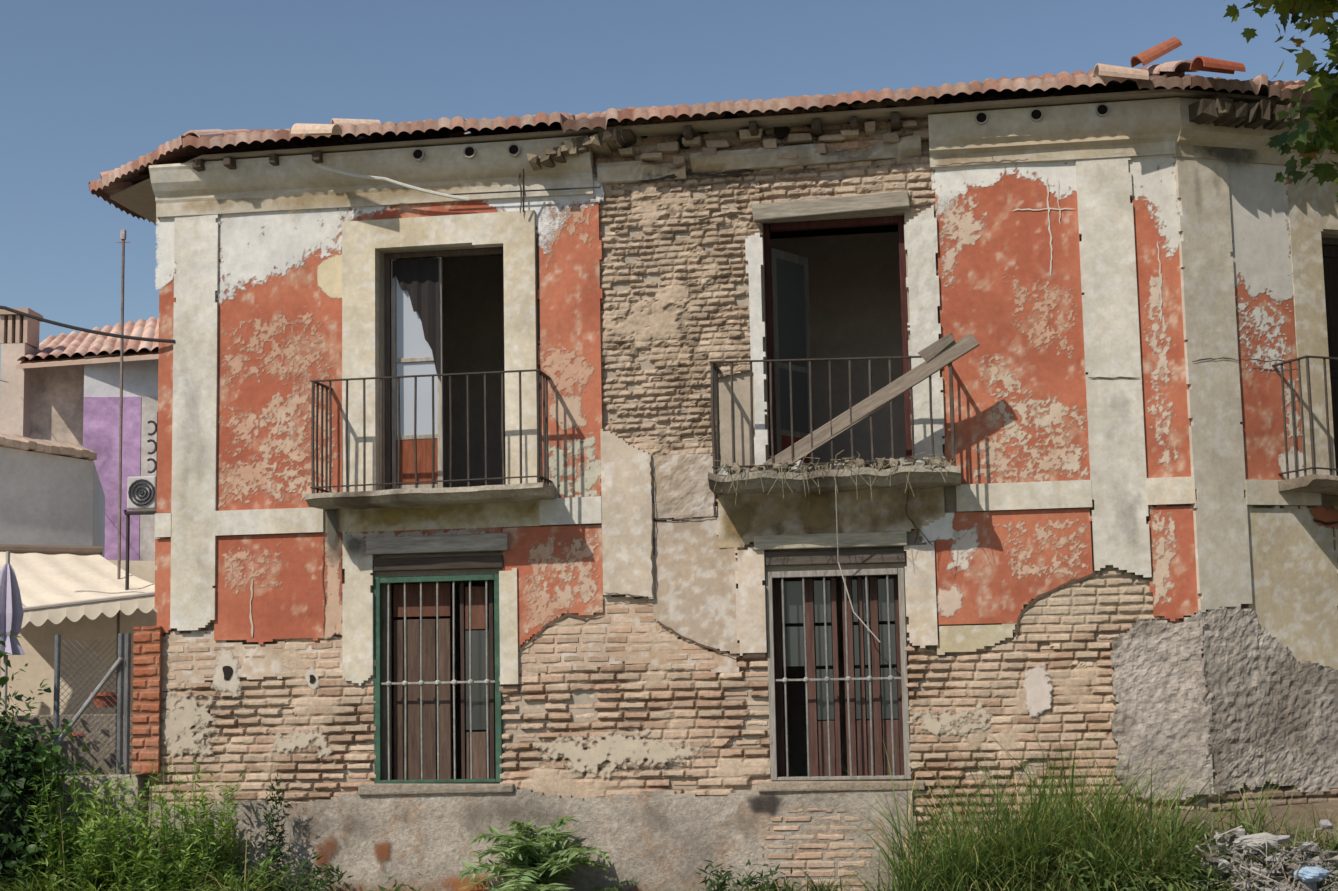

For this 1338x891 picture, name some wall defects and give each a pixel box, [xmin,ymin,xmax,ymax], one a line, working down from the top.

peeling [216,205,391,508]
flaking render [483,98,1089,498]
peeling [1128,155,1182,257]
peeling [1144,273,1178,464]
peeling [1228,162,1304,480]
flaking render [150,539,376,807]
flaking render [499,533,772,801]
flaking render [905,506,1199,846]